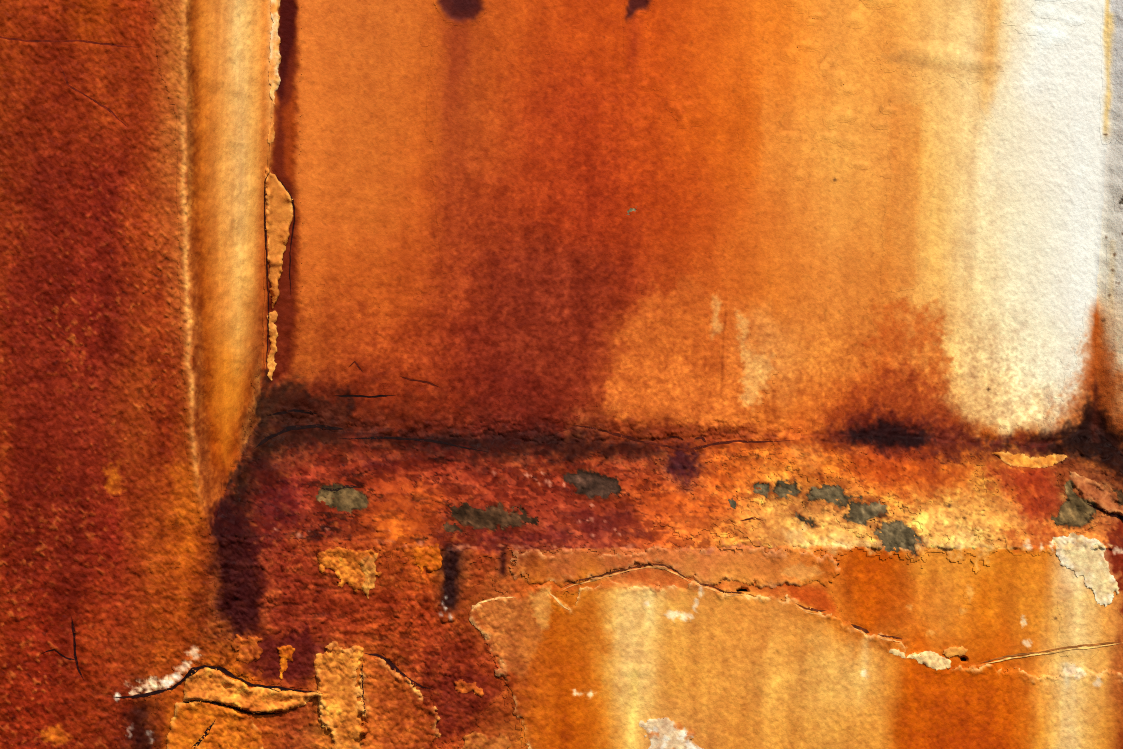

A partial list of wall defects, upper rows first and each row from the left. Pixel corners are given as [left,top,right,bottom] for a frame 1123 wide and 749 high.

peeling [269,0,281,102]
peeling [265,168,293,380]
rust [0,0,207,749]
crack [255,361,486,452]
rust [199,0,1077,749]
crack [558,425,790,452]
leakage [819,396,1062,472]
rust [1036,294,1123,488]
spalling [306,475,378,522]
peeling [317,451,1123,749]
rust [1103,515,1123,617]
peeling [111,641,441,749]